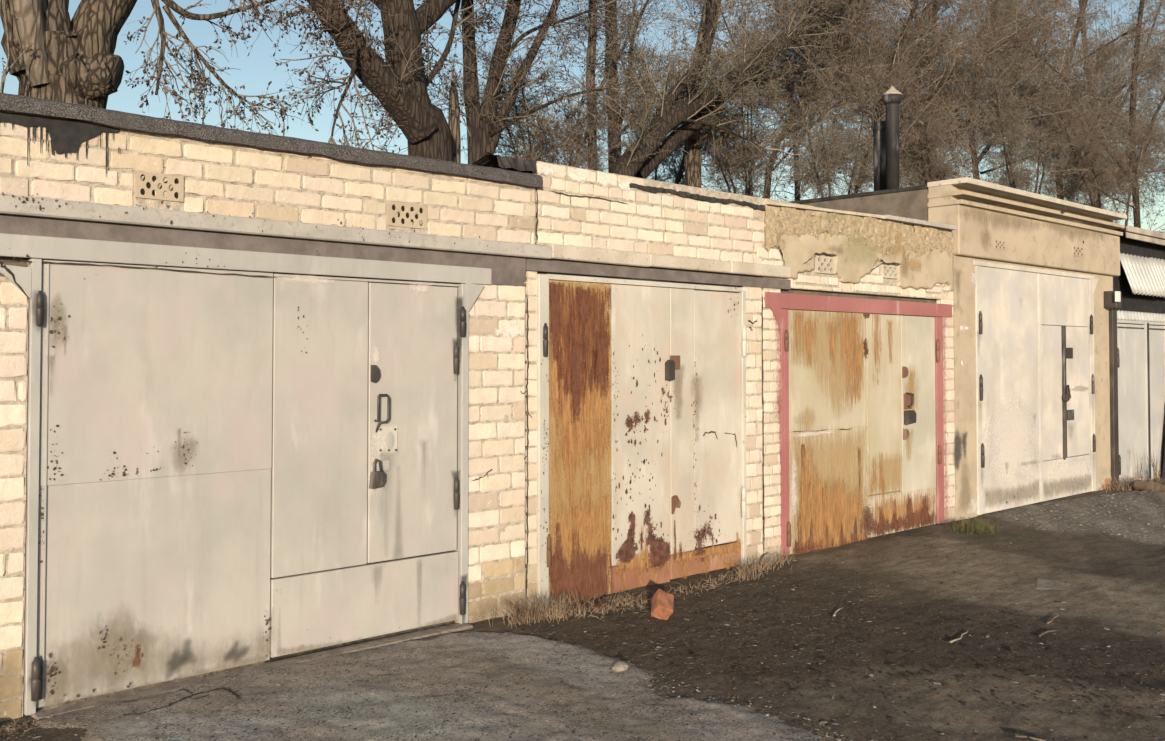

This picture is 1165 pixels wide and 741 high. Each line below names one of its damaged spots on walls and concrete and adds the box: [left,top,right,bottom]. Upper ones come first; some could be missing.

water stain [0,111,120,173]
flaking render [757,203,952,296]
corrosion [793,311,893,405]
corrosion [549,281,741,606]
corrosion [793,411,936,555]